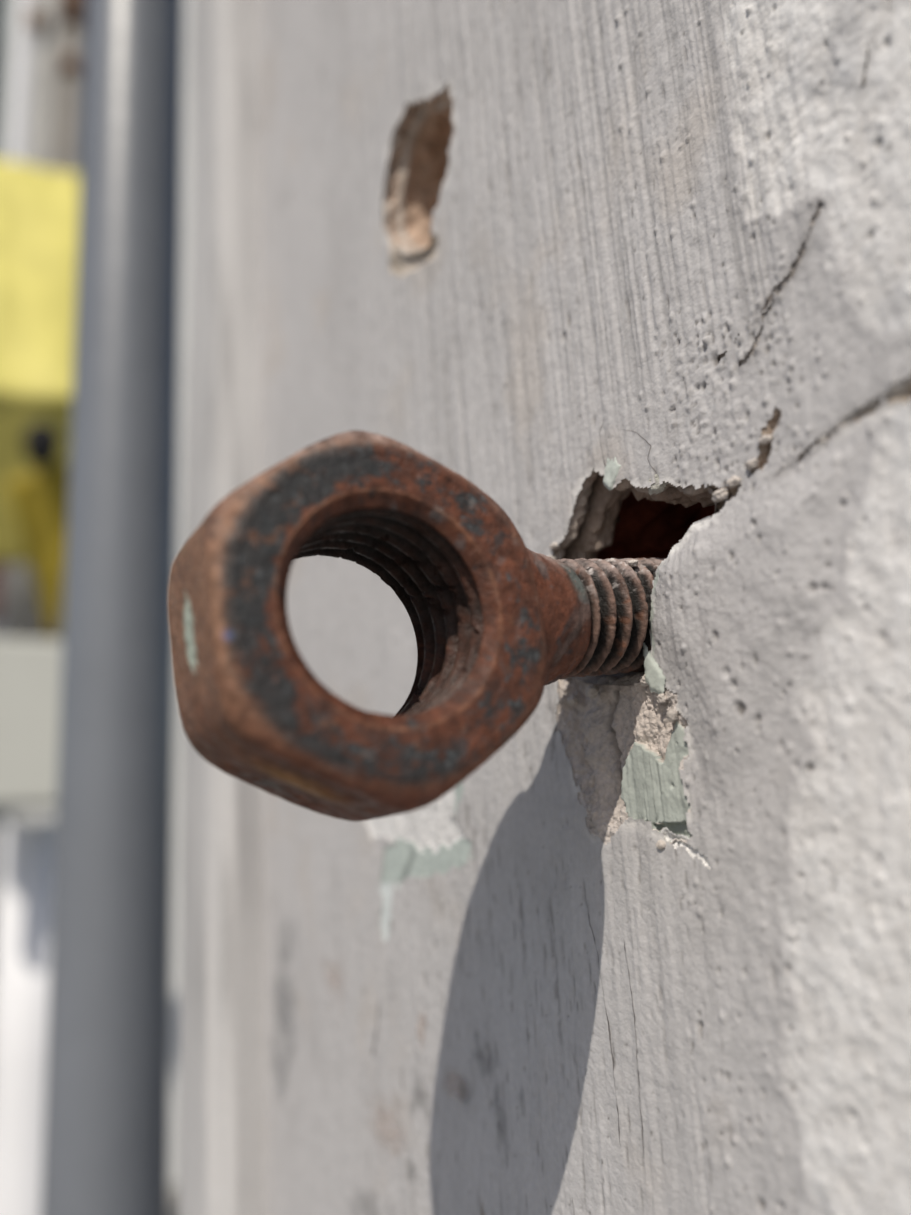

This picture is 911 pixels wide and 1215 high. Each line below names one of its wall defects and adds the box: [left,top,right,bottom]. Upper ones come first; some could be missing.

spalling [388,232,439,278]
crack [716,200,824,367]
spalling [548,406,782,567]
crack [797,396,886,463]
flaking render [555,643,713,869]